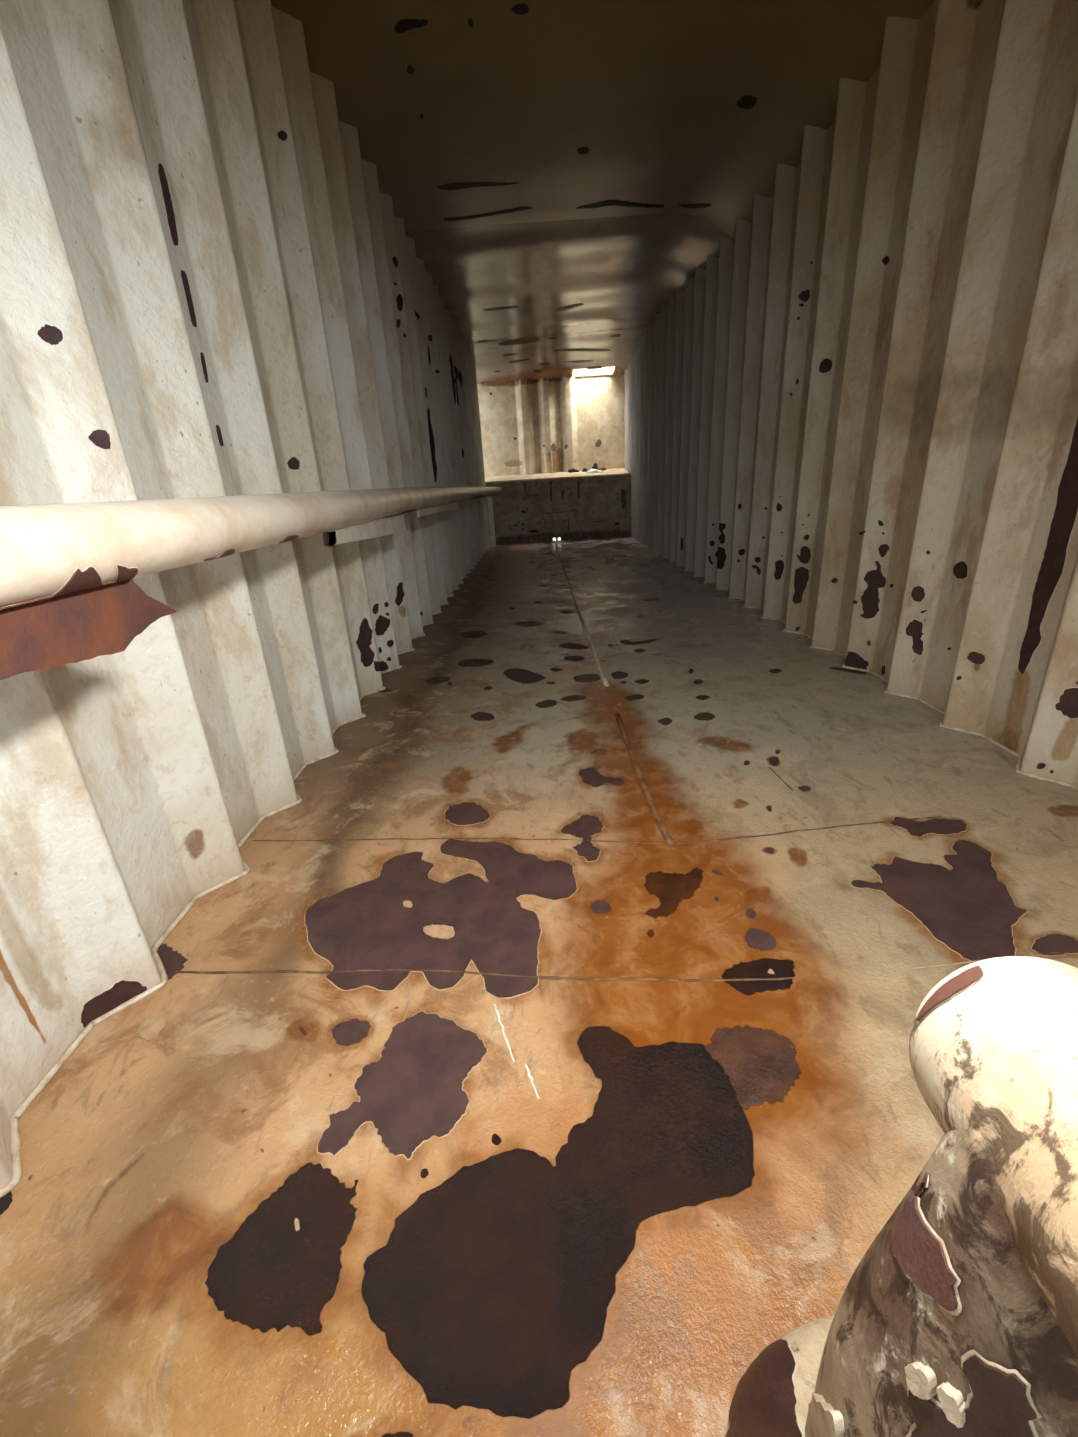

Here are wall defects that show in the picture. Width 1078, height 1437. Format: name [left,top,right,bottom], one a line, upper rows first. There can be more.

rust [204,549,236,562]
rust [355,582,423,672]
rust [708,514,811,604]
rust [998,416,1078,750]
rust [1036,681,1078,773]
rust [850,817,1078,1022]
rust [0,951,45,1041]
rust [101,607,849,1437]
rust [891,1171,962,1316]
rust [904,1349,1042,1437]